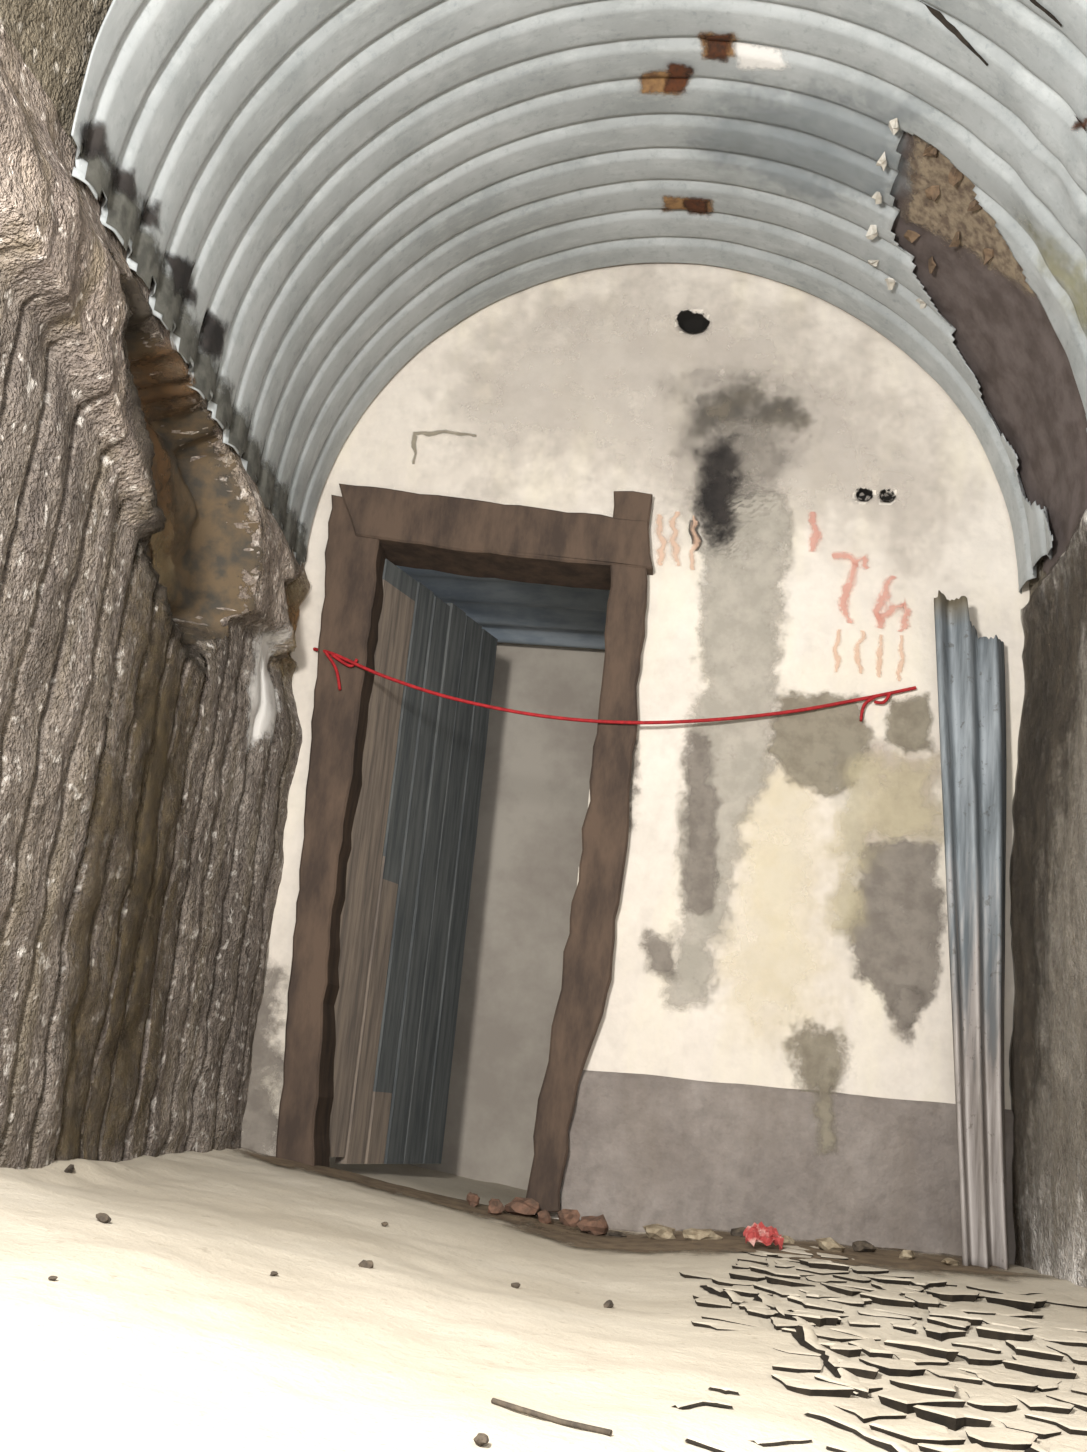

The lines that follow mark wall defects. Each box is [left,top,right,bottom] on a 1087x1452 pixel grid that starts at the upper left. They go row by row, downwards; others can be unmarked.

corrosion [640,33,786,95]
corrosion [662,196,713,214]
spalling [866,118,1087,576]
leakage [699,390,807,426]
spalling [110,252,263,676]
leakage [695,441,741,543]
spalling [856,488,896,502]
flaking render [641,492,932,1007]
flaking render [845,839,945,1039]
crack [670,1284,913,1452]
crack [1024,1441,1050,1452]